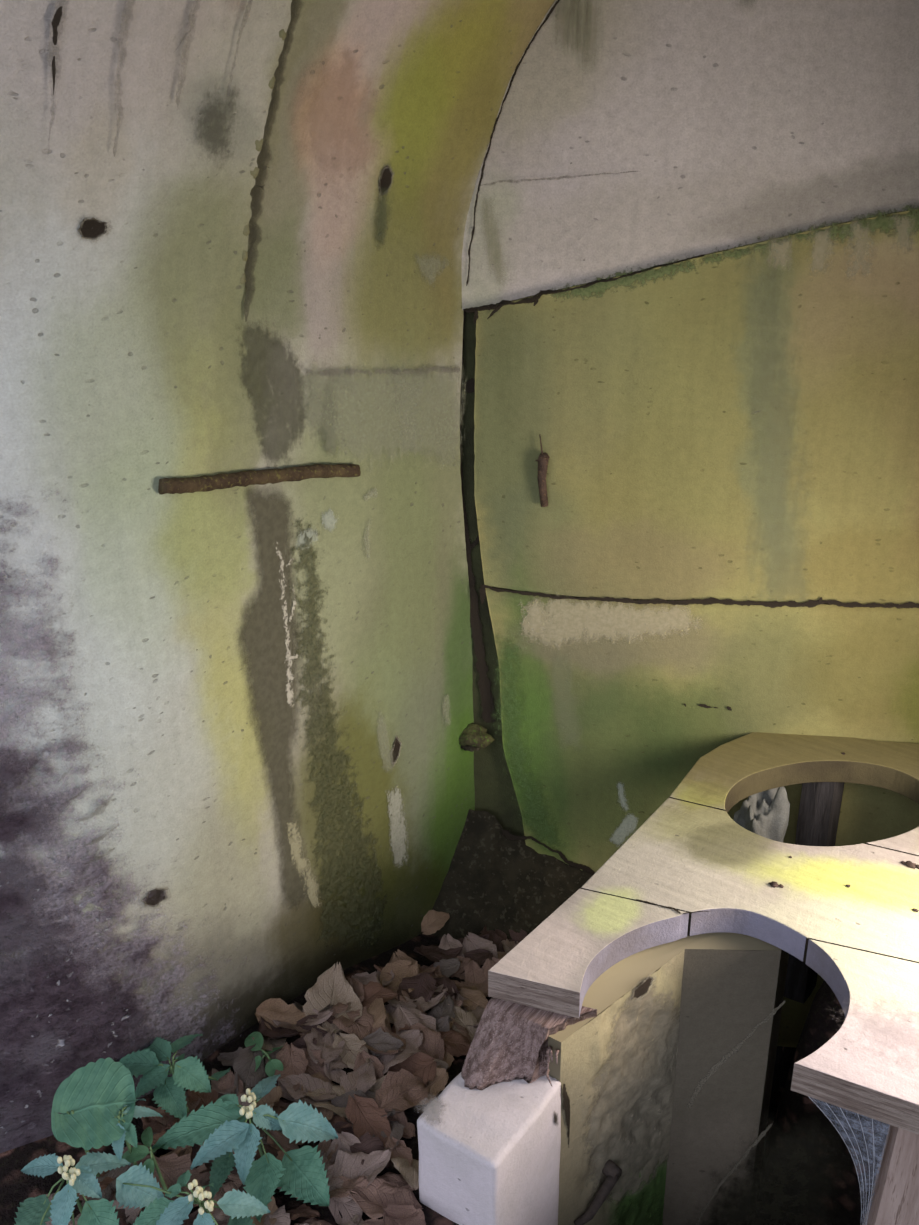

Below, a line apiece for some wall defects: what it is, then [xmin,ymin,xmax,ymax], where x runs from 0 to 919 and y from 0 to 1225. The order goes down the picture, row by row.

leakage [242,327,305,461]
crack [321,254,919,723]
leakage [240,490,317,906]